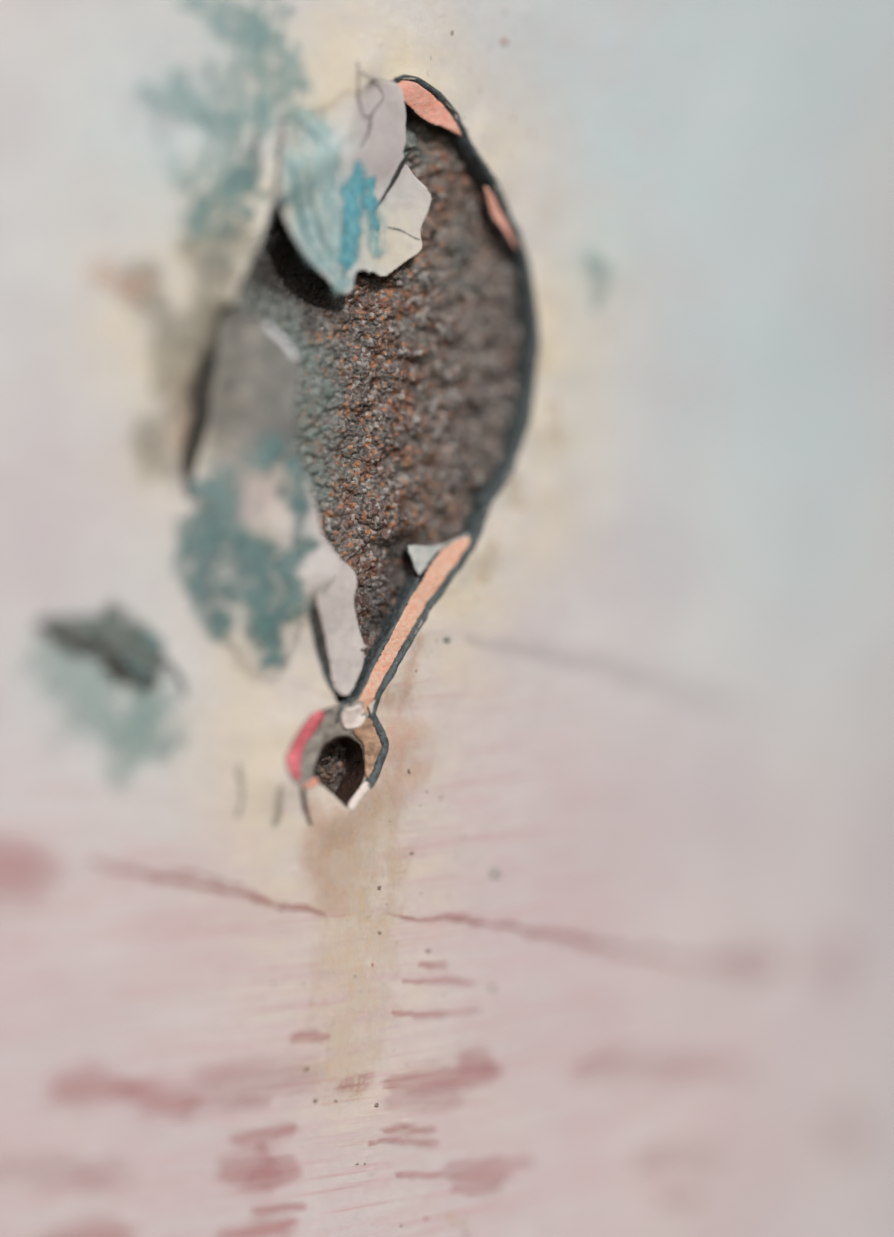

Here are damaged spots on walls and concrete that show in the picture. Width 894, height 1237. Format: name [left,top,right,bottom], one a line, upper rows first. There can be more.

damp [142,0,306,410]
damp [284,108,381,292]
damp [175,434,319,667]
peeling [233,74,540,811]